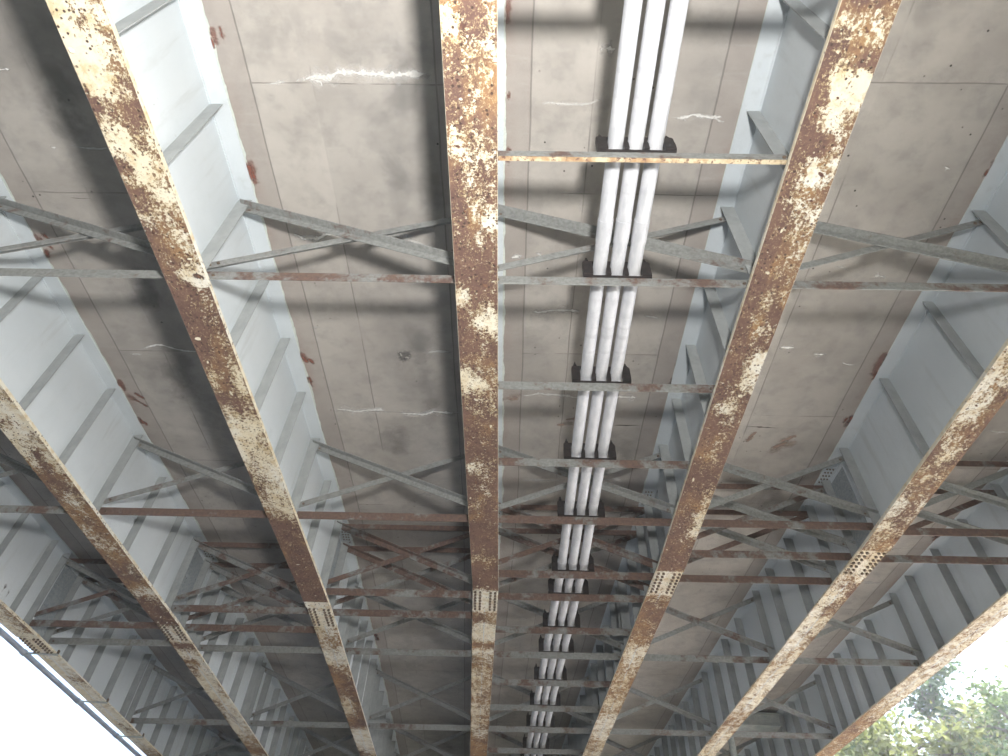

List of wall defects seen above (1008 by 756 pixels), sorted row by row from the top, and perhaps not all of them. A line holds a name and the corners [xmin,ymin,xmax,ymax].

corrosion [0,387,267,756]
corrosion [50,0,376,756]
crack [271,68,426,87]
corrosion [439,0,517,756]
corrosion [584,0,901,756]
corrosion [700,345,1008,756]